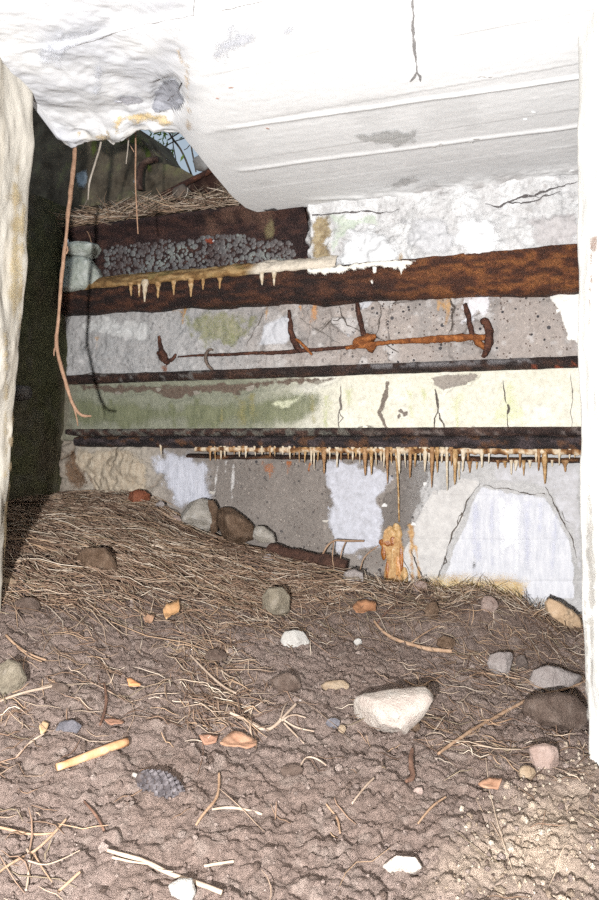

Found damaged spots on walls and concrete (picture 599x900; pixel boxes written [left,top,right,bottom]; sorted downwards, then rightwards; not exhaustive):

crack [409,0,421,82]
damp [354,128,419,148]
crack [488,182,576,208]
damp [84,255,416,302]
corrosion [436,298,452,325]
damp [273,388,329,427]
crack [377,381,389,428]
crack [434,389,445,427]
damp [64,445,581,522]
peeling [209,459,582,600]
corrosion [379,523,422,583]